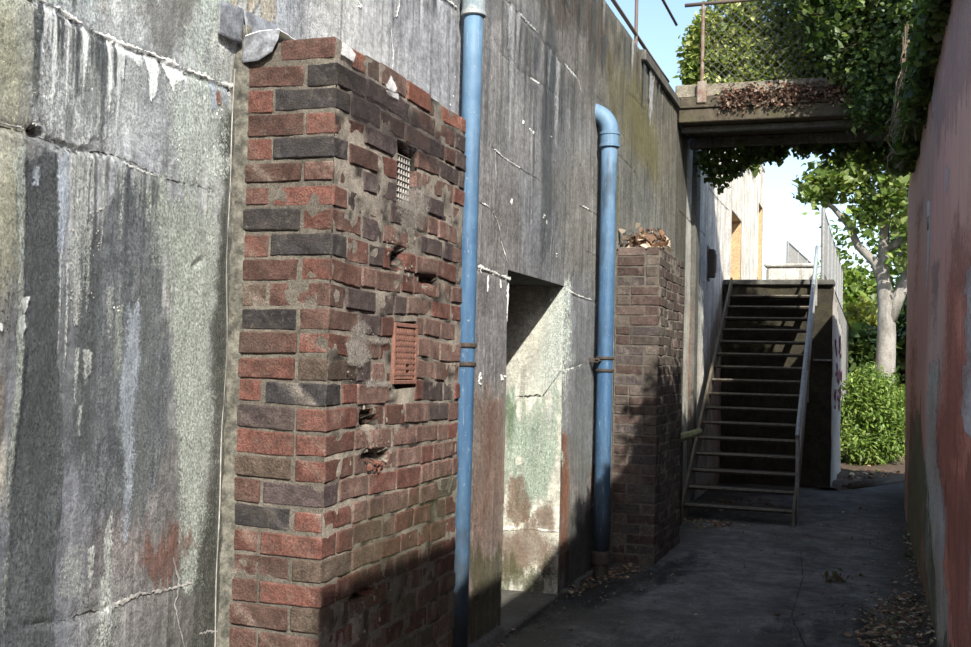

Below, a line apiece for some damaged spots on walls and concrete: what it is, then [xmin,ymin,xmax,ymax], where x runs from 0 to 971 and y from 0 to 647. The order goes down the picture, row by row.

crack [27,0,233,98]
damp [0,0,276,647]
spalling [386,236,434,285]
damp [501,282,571,532]
peeling [961,266,971,437]
crack [52,557,217,643]